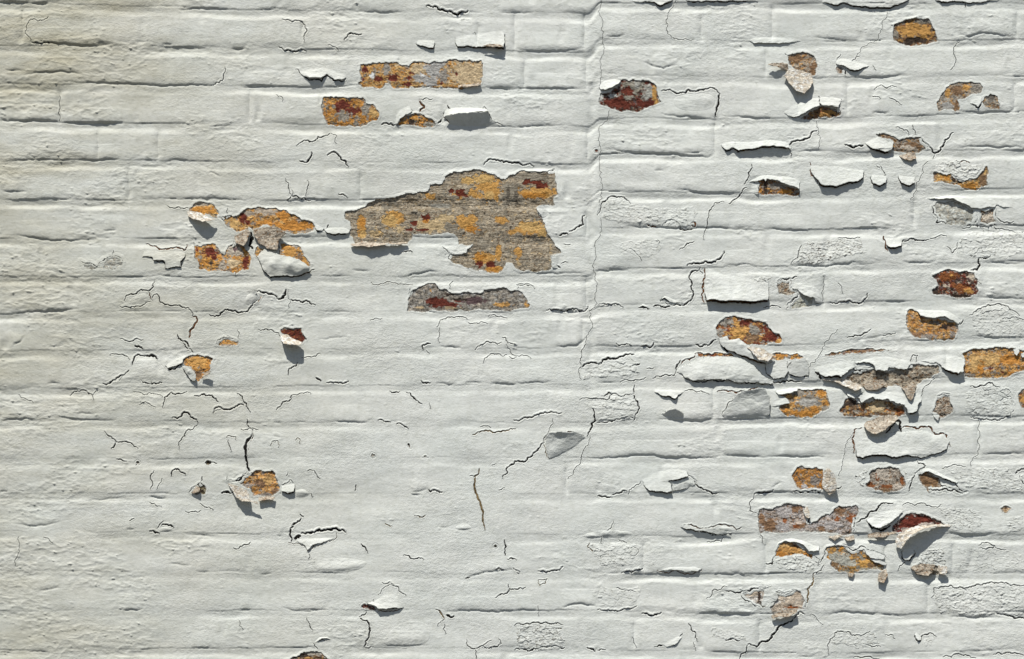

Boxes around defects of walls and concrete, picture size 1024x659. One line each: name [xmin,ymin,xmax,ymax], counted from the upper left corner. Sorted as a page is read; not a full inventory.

peeling [890,15,940,48]
peeling [295,30,505,130]
peeling [596,77,722,117]
peeling [934,79,1003,114]
crack [516,0,611,380]
peeling [142,166,568,319]
crack [119,281,200,339]
crack [120,336,144,351]
peeling [543,124,1024,621]
crack [103,430,139,464]
crack [133,352,351,515]
crack [585,645,606,653]